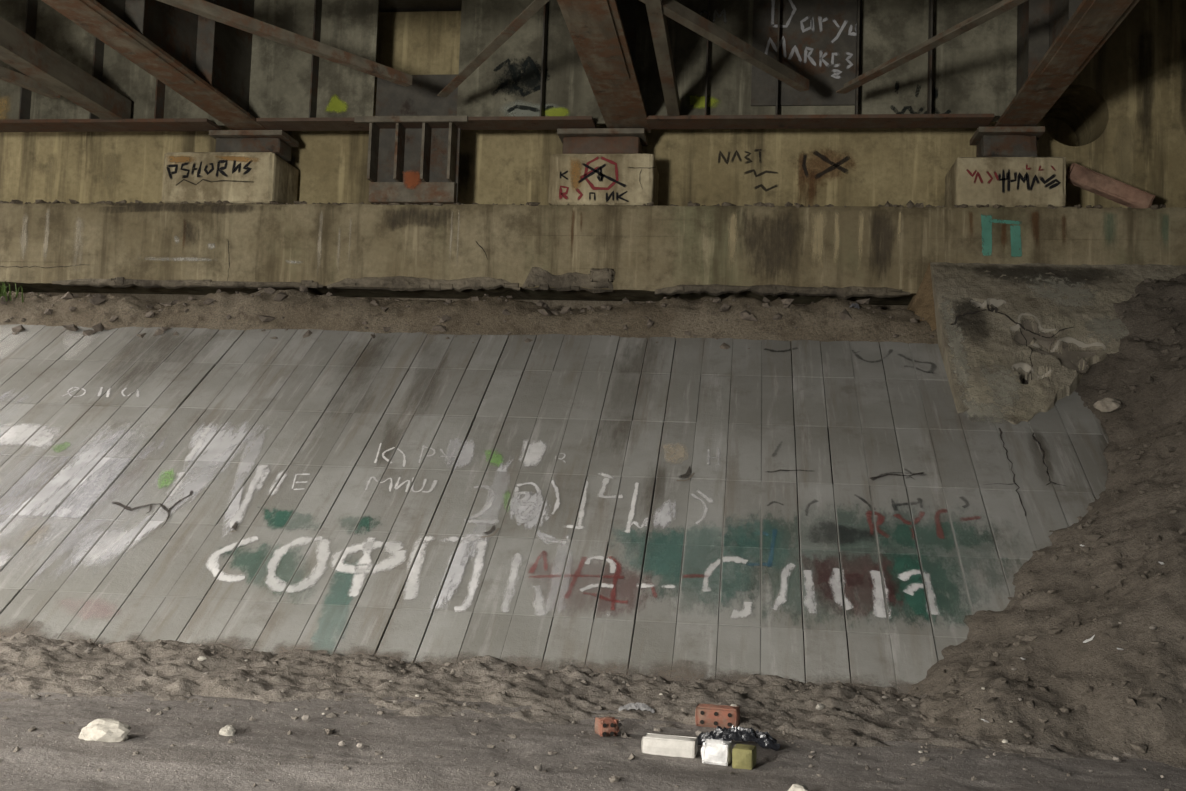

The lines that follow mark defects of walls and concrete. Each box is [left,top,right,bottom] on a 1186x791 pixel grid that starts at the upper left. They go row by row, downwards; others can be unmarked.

damp [813,212,839,257]
damp [858,212,901,270]
spalling [970,298,1006,313]
crack [950,309,1073,380]
spalling [1010,313,1106,384]
crack [985,428,1065,516]